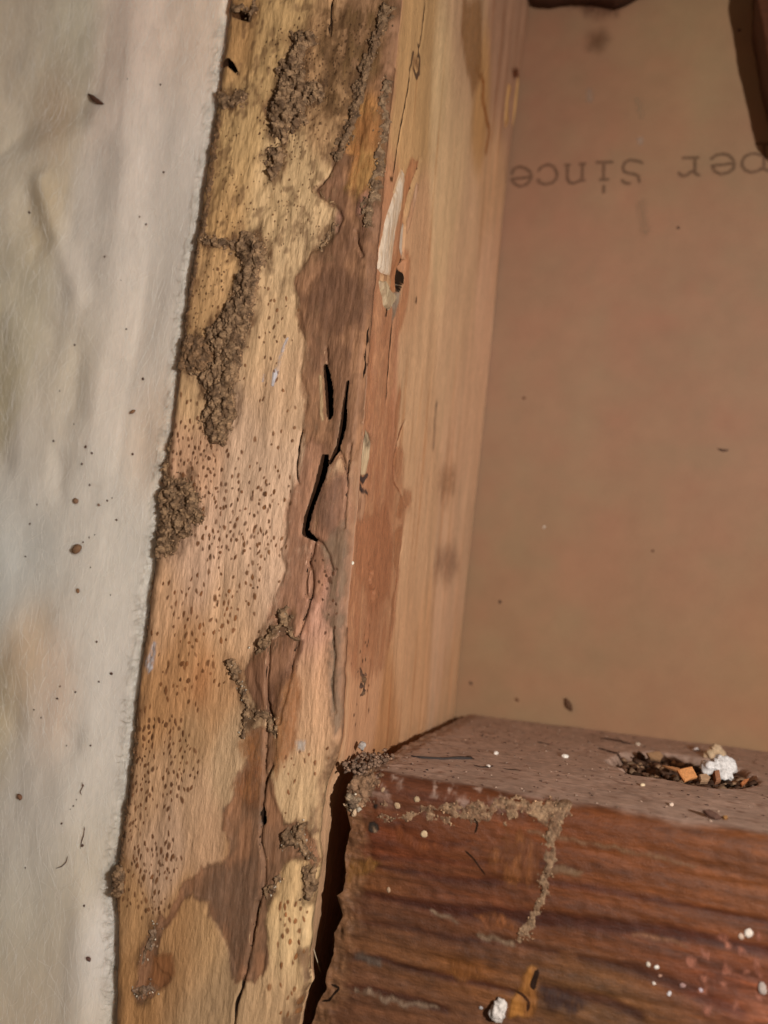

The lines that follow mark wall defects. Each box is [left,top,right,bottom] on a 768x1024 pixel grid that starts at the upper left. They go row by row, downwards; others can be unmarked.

crack [342,446,352,512]
crack [259,741,273,845]
crack [234,974,246,1024]